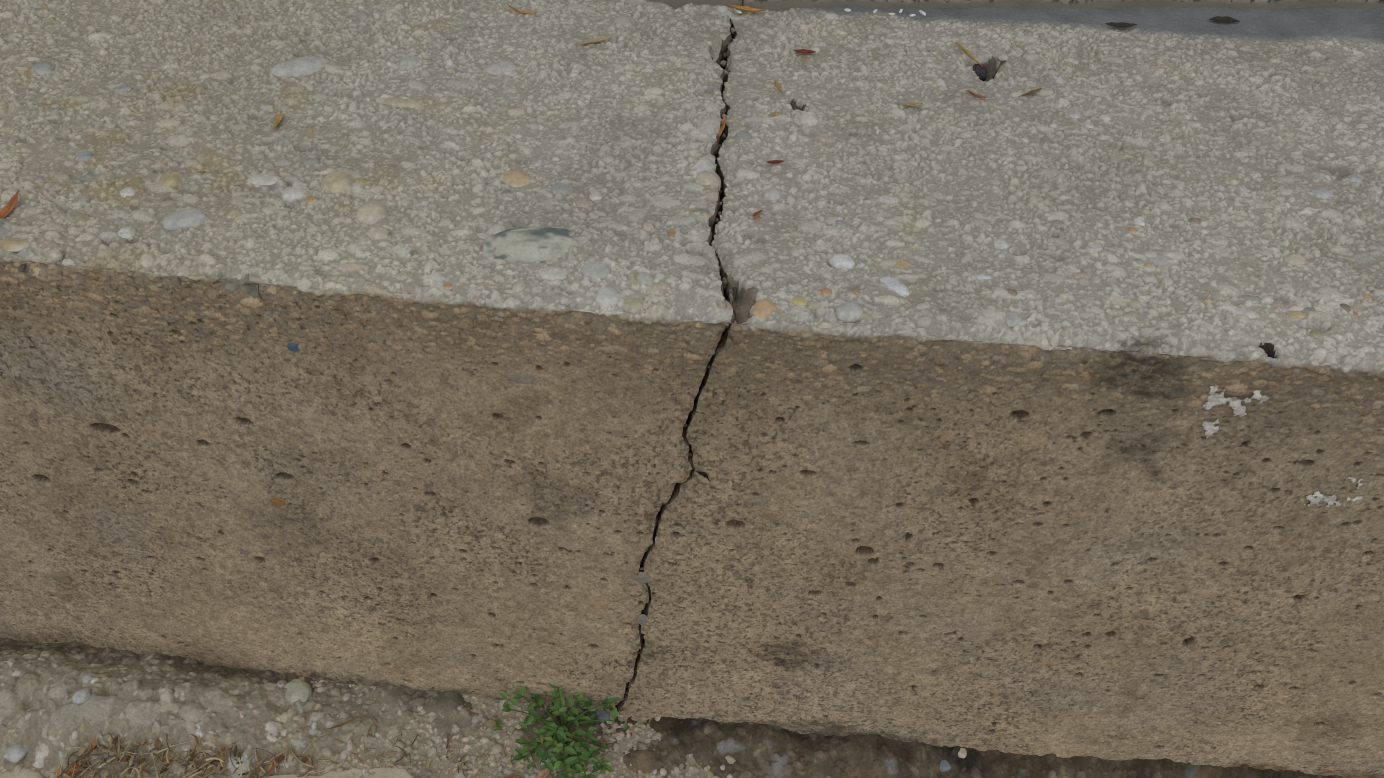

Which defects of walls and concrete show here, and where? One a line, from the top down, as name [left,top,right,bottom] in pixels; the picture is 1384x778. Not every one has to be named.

crack [611,21,737,711]
peeling [1195,386,1269,438]